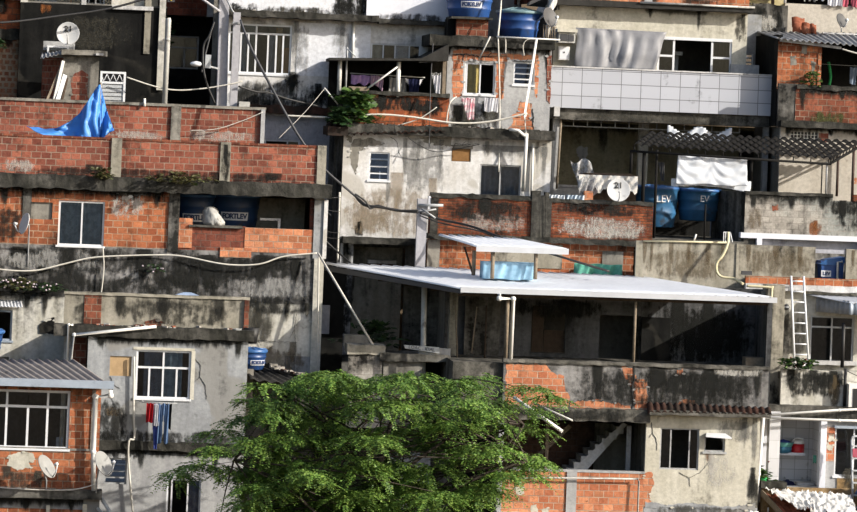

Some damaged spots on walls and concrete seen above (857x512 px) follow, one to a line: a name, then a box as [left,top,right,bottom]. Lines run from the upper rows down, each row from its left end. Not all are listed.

damp [229,0,367,108]
flaking render [451,48,553,130]
damp [121,144,295,182]
damp [483,141,547,171]
damp [748,194,857,228]
damp [0,187,314,370]
damp [509,298,604,318]
damp [511,303,843,419]
flaking render [503,363,650,410]
damp [99,400,234,467]
damp [723,418,757,456]
damp [659,467,759,512]